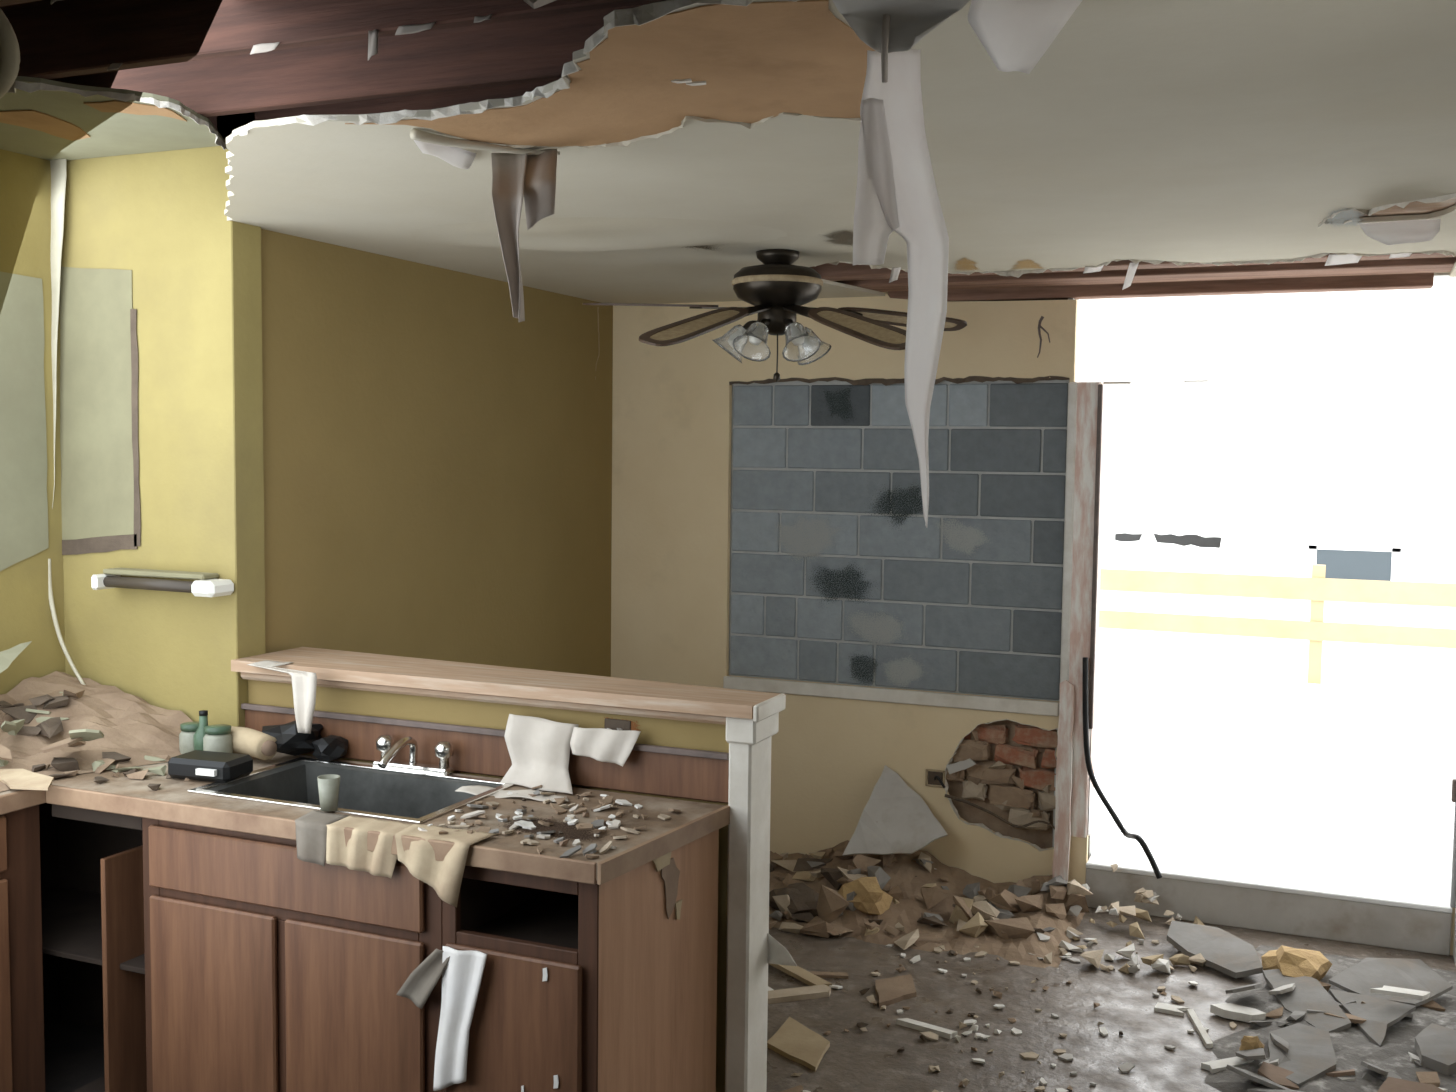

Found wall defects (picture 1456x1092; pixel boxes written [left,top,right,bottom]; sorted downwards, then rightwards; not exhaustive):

peeling [345,0,875,149]
peeling [0,76,227,571]
flaking render [945,719,1058,851]